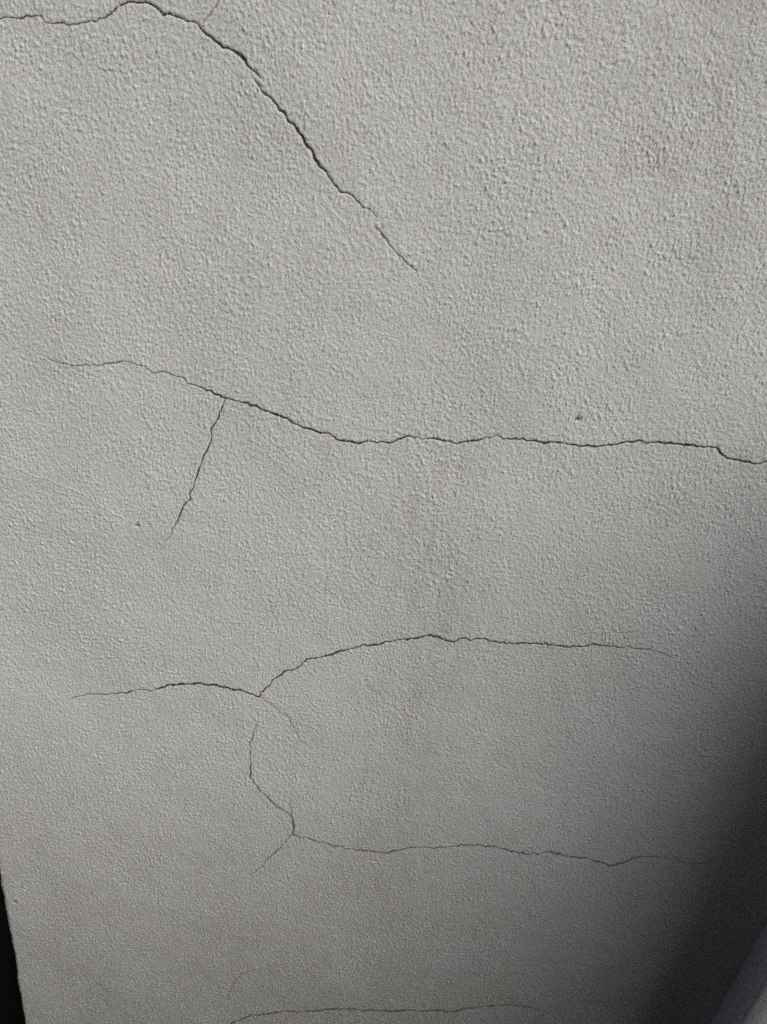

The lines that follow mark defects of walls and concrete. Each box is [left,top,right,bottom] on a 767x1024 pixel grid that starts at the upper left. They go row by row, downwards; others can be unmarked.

crack [0,0,417,271]
crack [50,359,767,541]
crack [69,634,716,875]